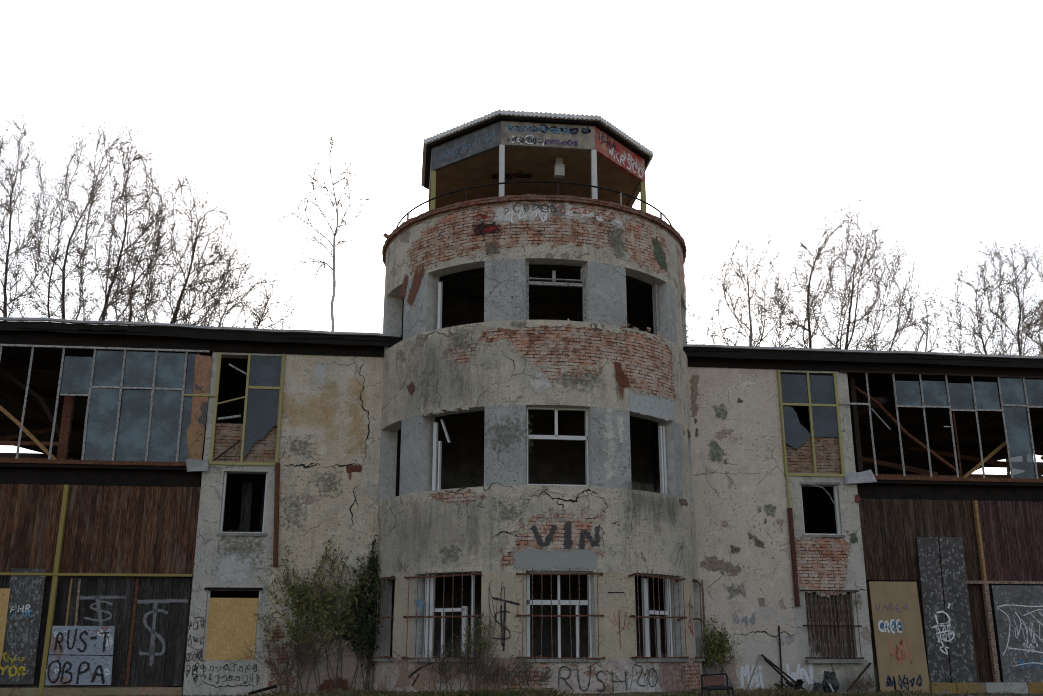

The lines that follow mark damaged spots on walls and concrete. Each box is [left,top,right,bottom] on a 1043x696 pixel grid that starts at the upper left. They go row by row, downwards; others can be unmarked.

spalling [407,194,685,295]
spalling [448,319,677,404]
crack [284,359,370,529]
peeling [601,402,628,482]
spalling [689,374,700,437]
peeling [708,398,743,464]
crack [428,479,620,545]
flaking render [499,484,609,567]
peeling [757,504,776,524]
peeling [700,532,766,607]
flaking render [789,533,853,599]